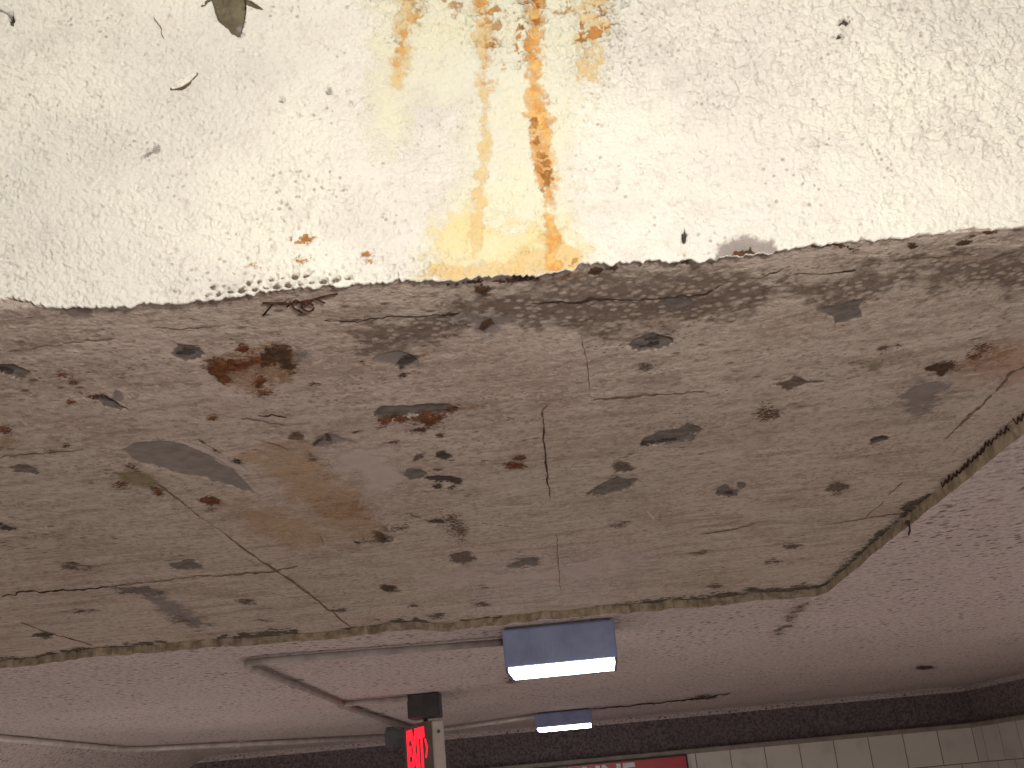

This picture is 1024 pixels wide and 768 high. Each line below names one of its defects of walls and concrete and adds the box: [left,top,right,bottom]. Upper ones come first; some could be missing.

spalling [201,0,263,37]
rust [369,0,614,296]
rust [202,343,308,398]
rust [374,403,458,438]
crack [541,405,550,495]